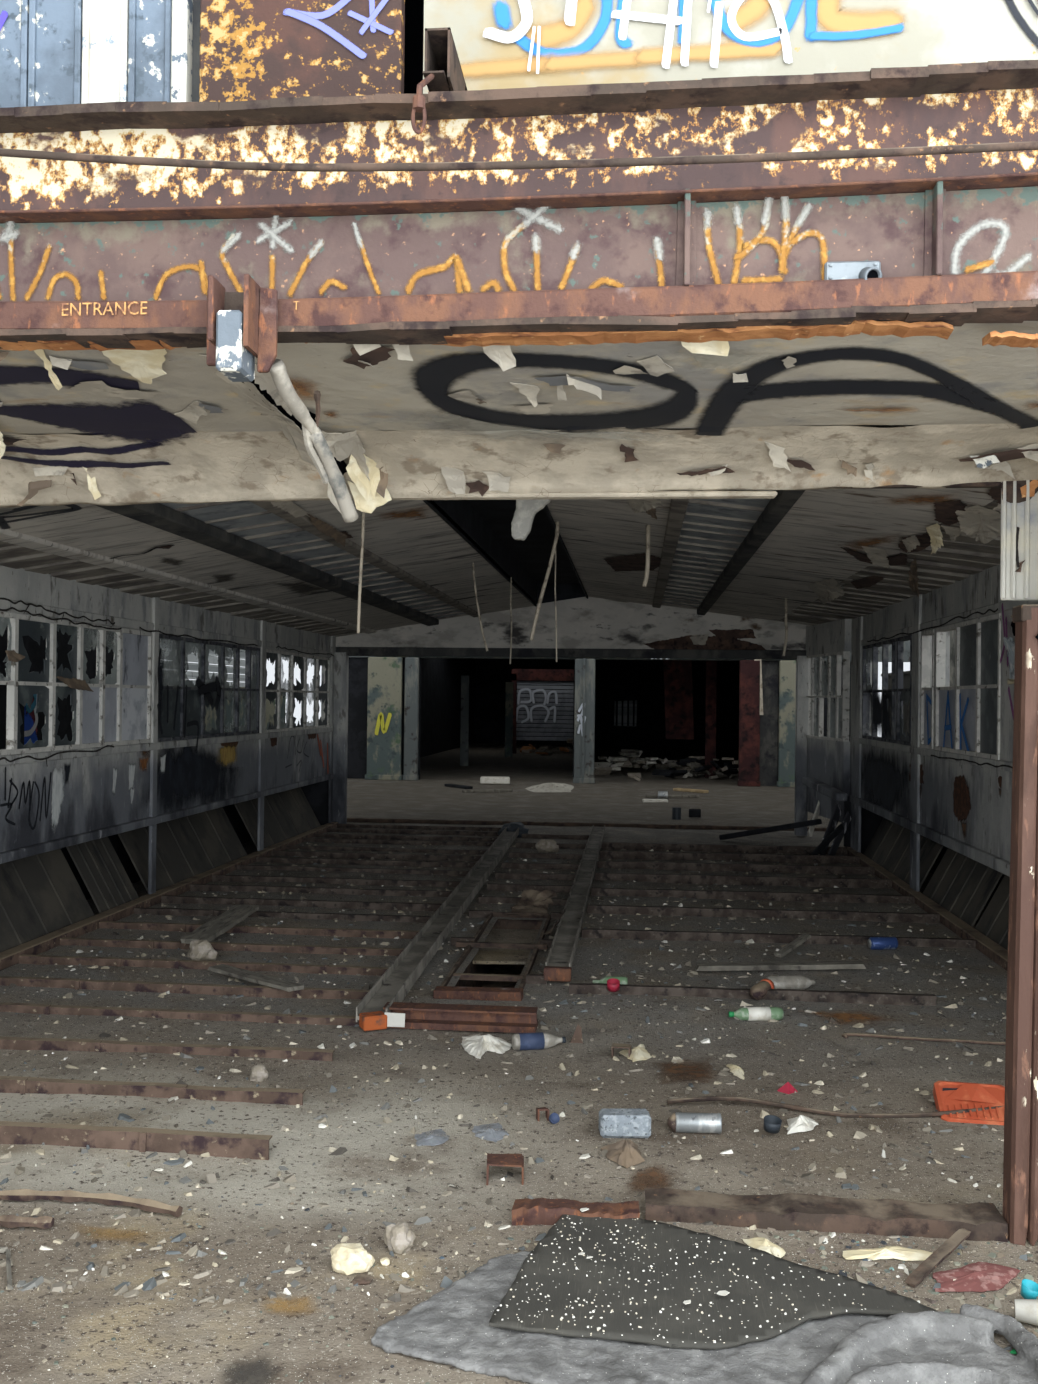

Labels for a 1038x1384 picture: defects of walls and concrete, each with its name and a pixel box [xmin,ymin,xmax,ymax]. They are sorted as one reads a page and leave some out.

corrosion [224,292,244,314]
peeling [34,348,167,399]
peeling [344,344,413,369]
peeling [483,345,674,415]
corrosion [432,320,954,347]
peeling [681,341,730,356]
corrosion [982,331,1038,348]
crack [198,354,357,475]
peeling [959,443,1038,479]
peeling [17,466,101,506]
peeling [270,434,392,547]
peeling [902,503,1001,597]